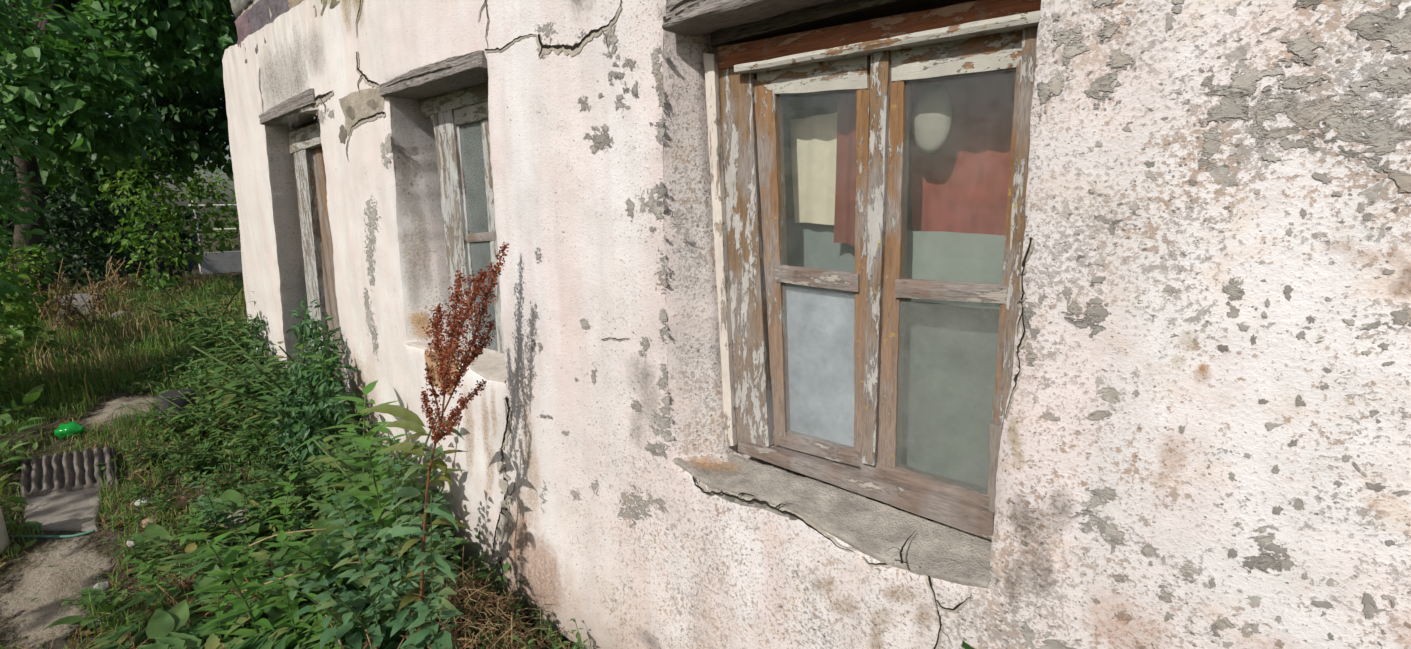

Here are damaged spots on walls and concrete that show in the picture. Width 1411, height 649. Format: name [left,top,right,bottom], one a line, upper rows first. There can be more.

crack [302,0,385,159]
crack [478,0,622,58]
peeling [577,19,670,154]
peeling [1189,0,1411,196]
peeling [364,196,381,361]
crack [1004,237,1035,419]
peeling [1222,277,1294,345]
crack [492,397,516,589]
crack [692,476,972,649]
peeling [1074,480,1216,624]
peeling [1207,596,1262,649]
peeling [1227,498,1308,580]